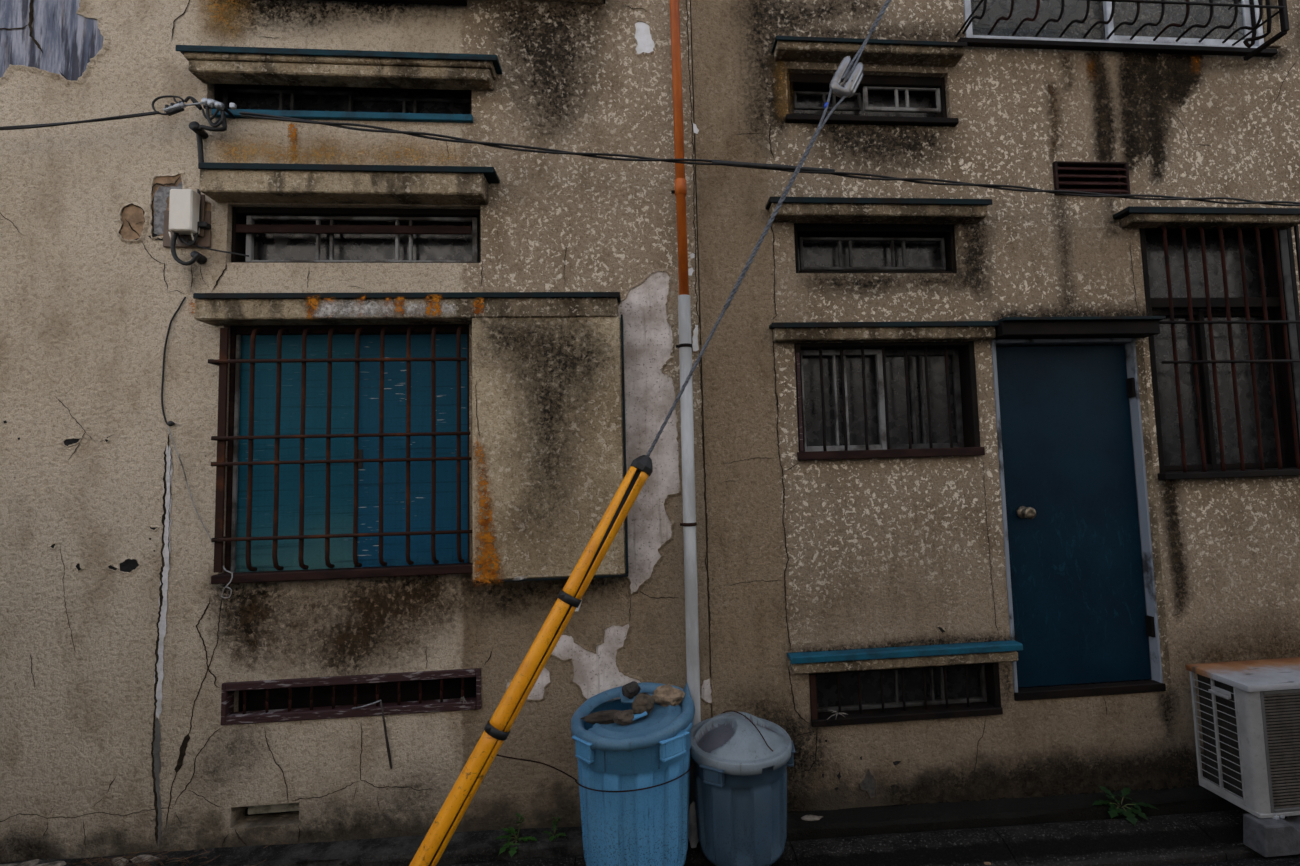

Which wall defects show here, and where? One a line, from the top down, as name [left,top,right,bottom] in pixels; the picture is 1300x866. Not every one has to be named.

flaking render [0,0,111,88]
flaking render [631,18,658,57]
damp [1088,51,1201,182]
flaking render [116,172,188,245]
corrosion [425,295,442,317]
flaking render [618,269,701,597]
corrosion [474,440,500,584]
damp [1161,480,1189,615]
crack [0,433,247,849]
damp [215,575,565,671]
flaking render [526,621,644,702]
crack [264,721,428,839]